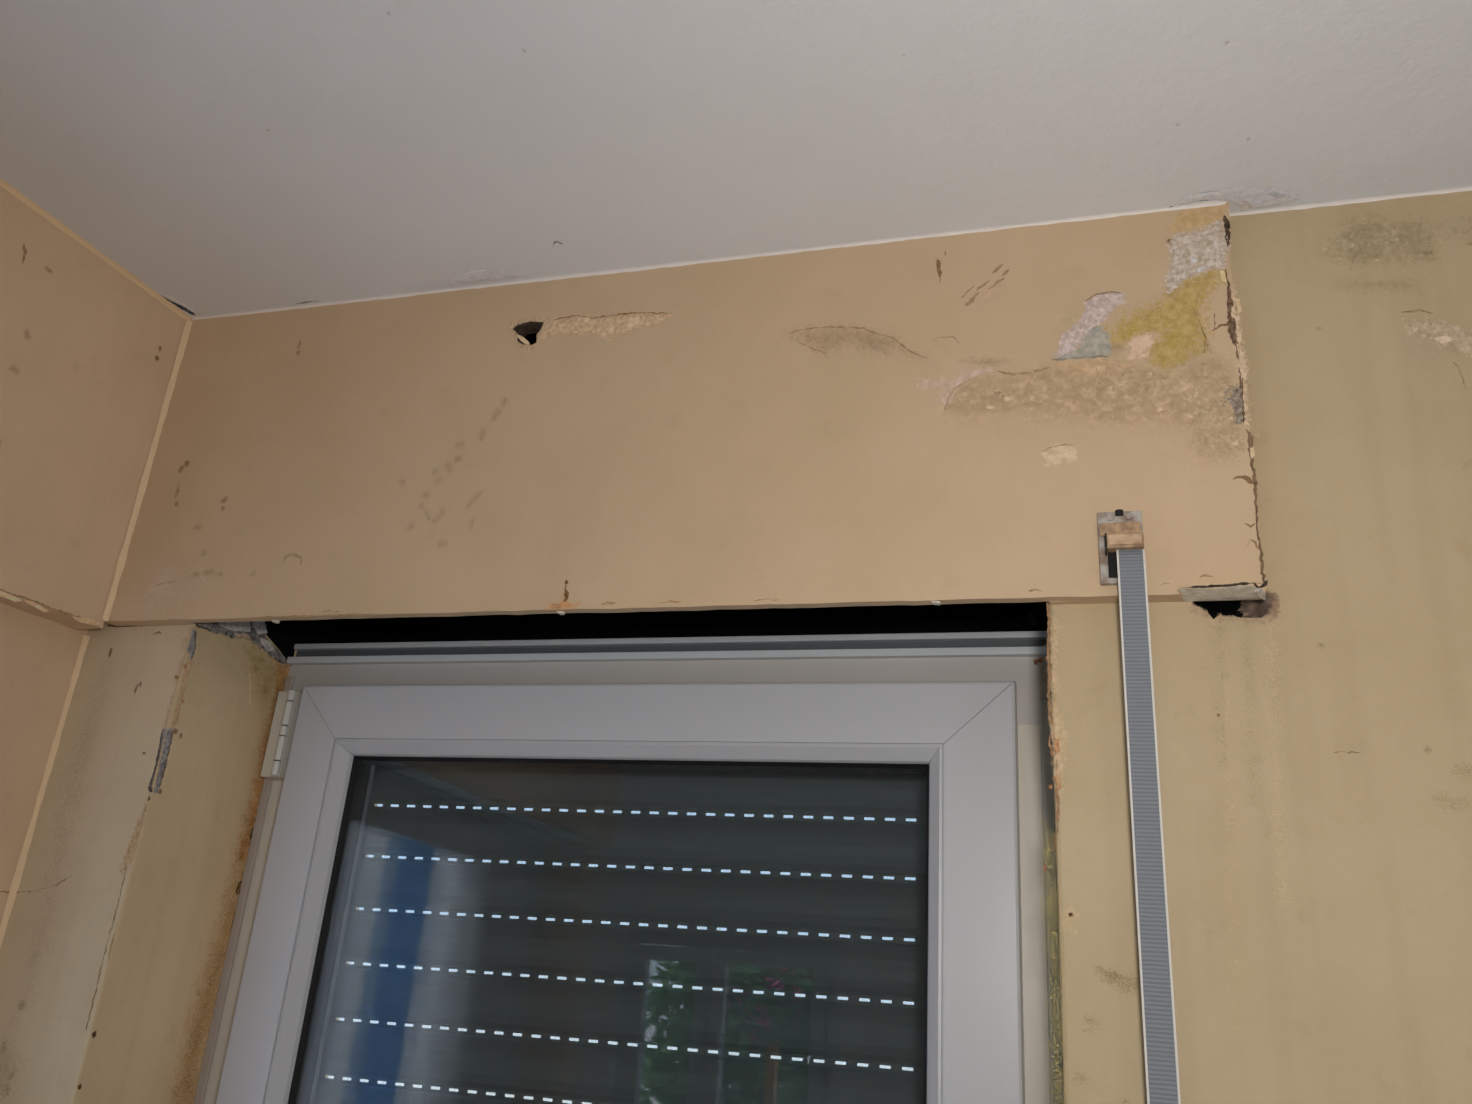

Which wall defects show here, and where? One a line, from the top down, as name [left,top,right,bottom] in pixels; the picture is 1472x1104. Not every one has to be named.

peeling [1160,185,1307,296]
peeling [513,310,675,345]
peeling [1051,290,1127,364]
crack [1212,215,1266,585]
peeling [0,589,103,625]
spalling [86,610,370,1030]